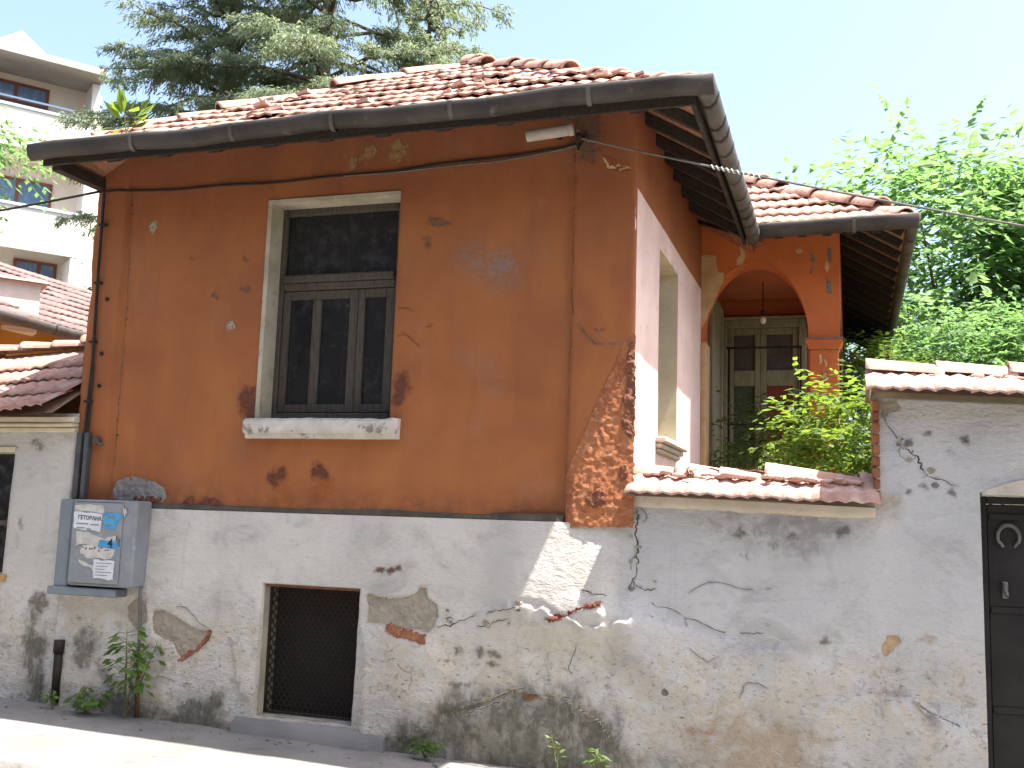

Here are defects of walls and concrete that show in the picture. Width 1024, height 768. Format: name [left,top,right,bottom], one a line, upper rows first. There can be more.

peeling [701,255,724,329]
corrosion [268,467,285,486]
spalling [565,334,636,528]
crack [879,410,959,490]
damp [25,593,48,703]
spalling [127,598,211,662]
peeling [367,586,438,644]
crack [434,601,523,631]
crack [581,507,771,665]
spalling [881,635,902,657]
damp [391,684,627,768]
crack [738,680,769,699]